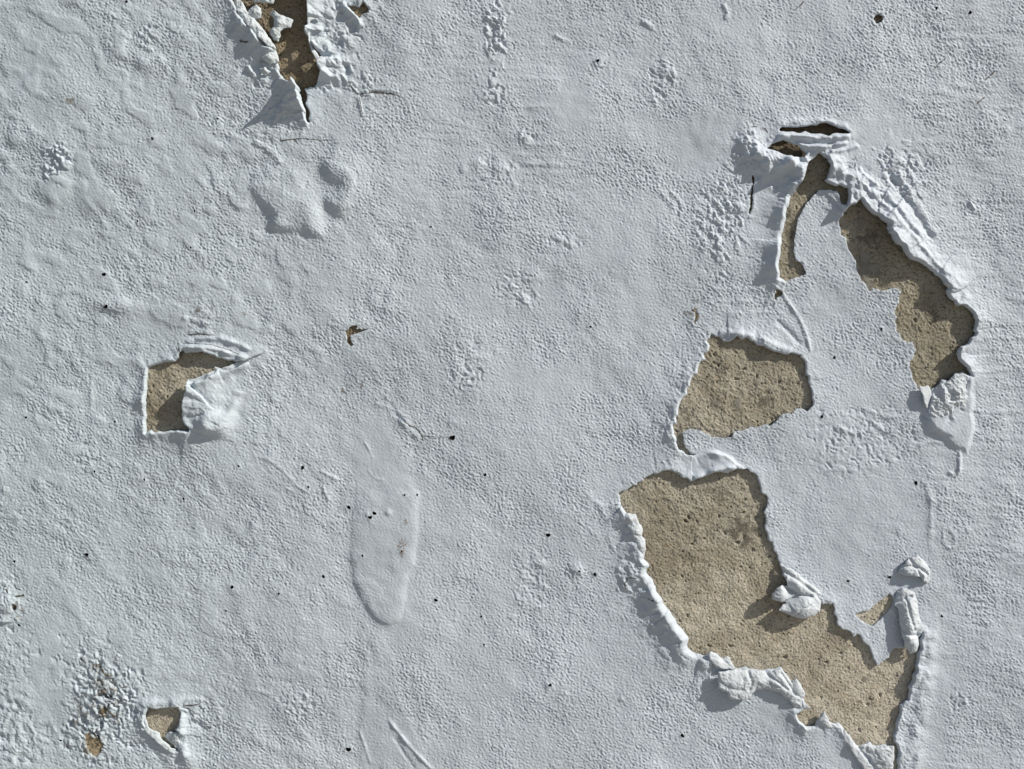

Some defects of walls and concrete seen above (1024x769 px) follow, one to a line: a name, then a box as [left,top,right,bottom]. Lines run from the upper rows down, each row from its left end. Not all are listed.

peeling [212,0,344,144]
peeling [341,0,377,27]
peeling [759,144,1003,431]
peeling [126,332,282,449]
peeling [594,305,946,769]
peeling [64,650,192,767]